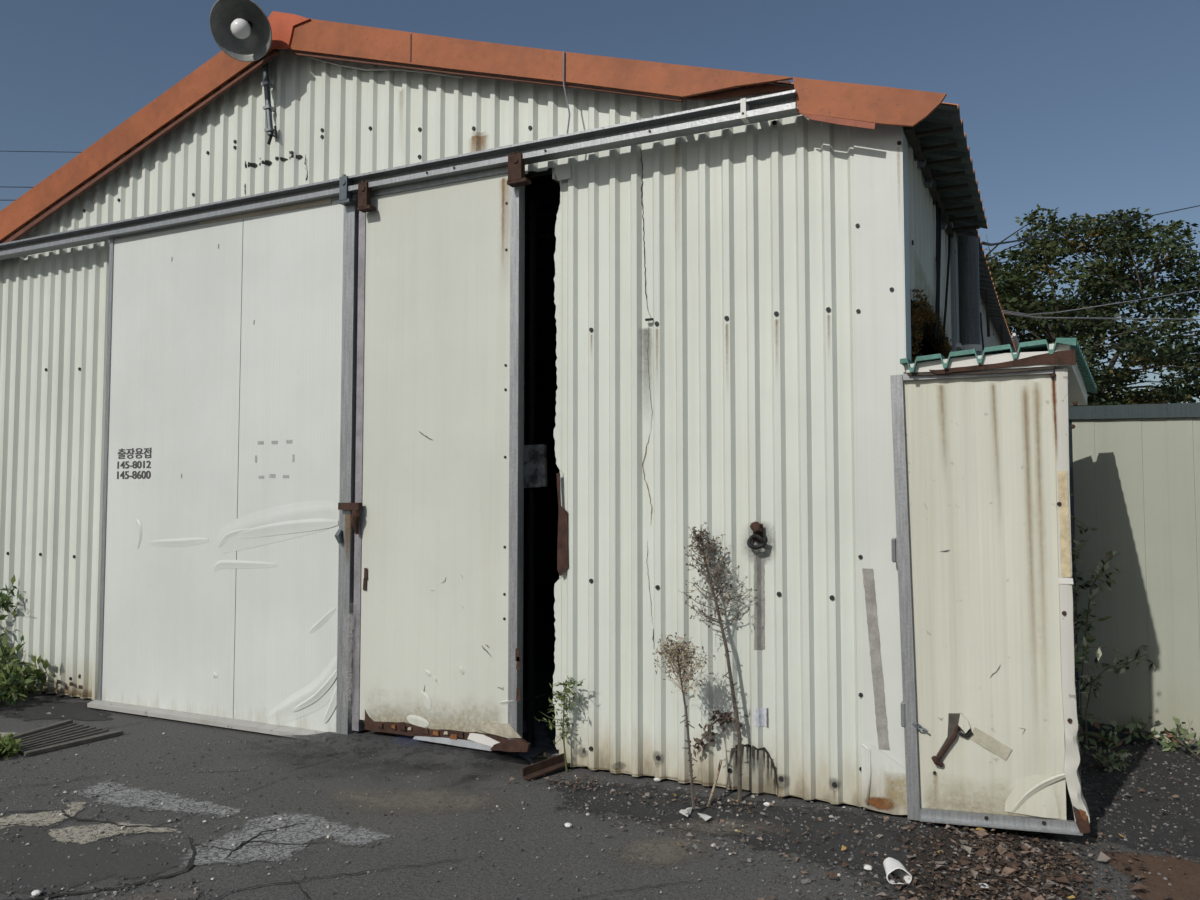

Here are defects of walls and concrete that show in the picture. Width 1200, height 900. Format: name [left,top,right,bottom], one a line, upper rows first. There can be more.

crack [639,146,654,515]
rust [365,710,531,752]
damp [729,744,779,796]